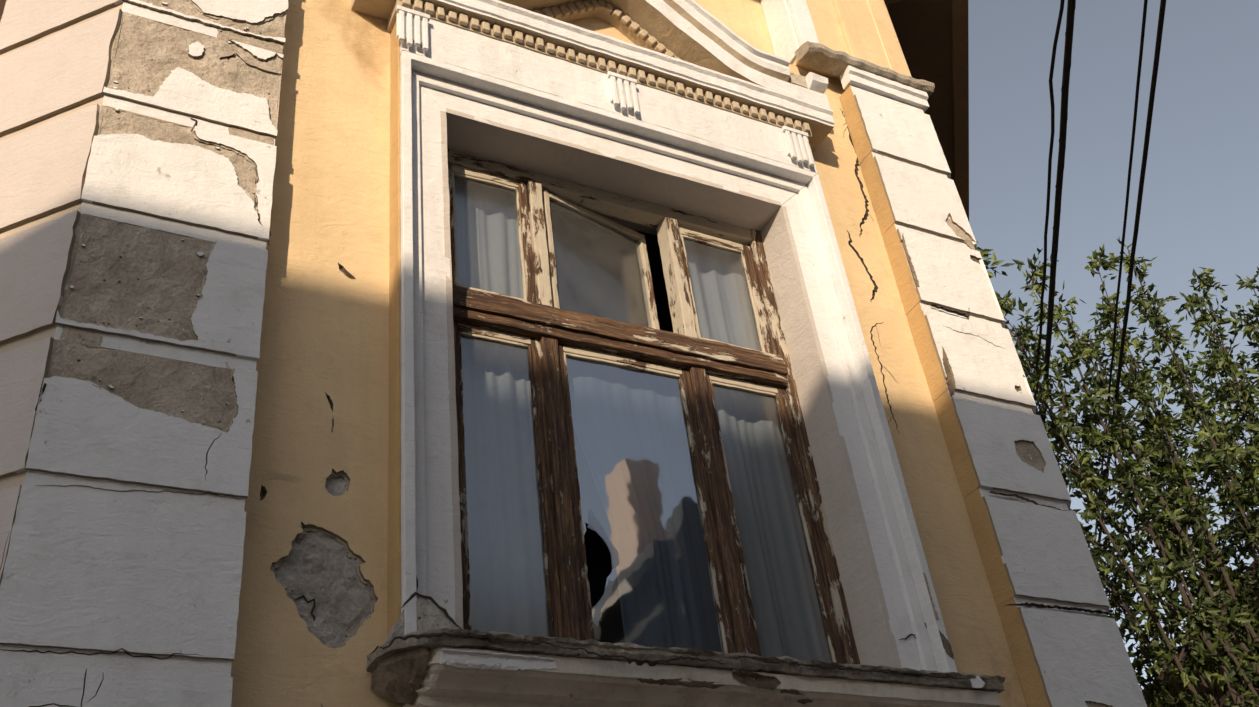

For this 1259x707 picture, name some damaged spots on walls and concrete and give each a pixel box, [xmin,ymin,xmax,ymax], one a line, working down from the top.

spalling [99,0,287,245]
spalling [50,214,238,433]
crack [840,109,899,432]
spalling [325,472,349,496]
spalling [1014,441,1044,471]
crack [0,649,173,707]
spalling [270,525,377,648]
spalling [371,575,462,706]